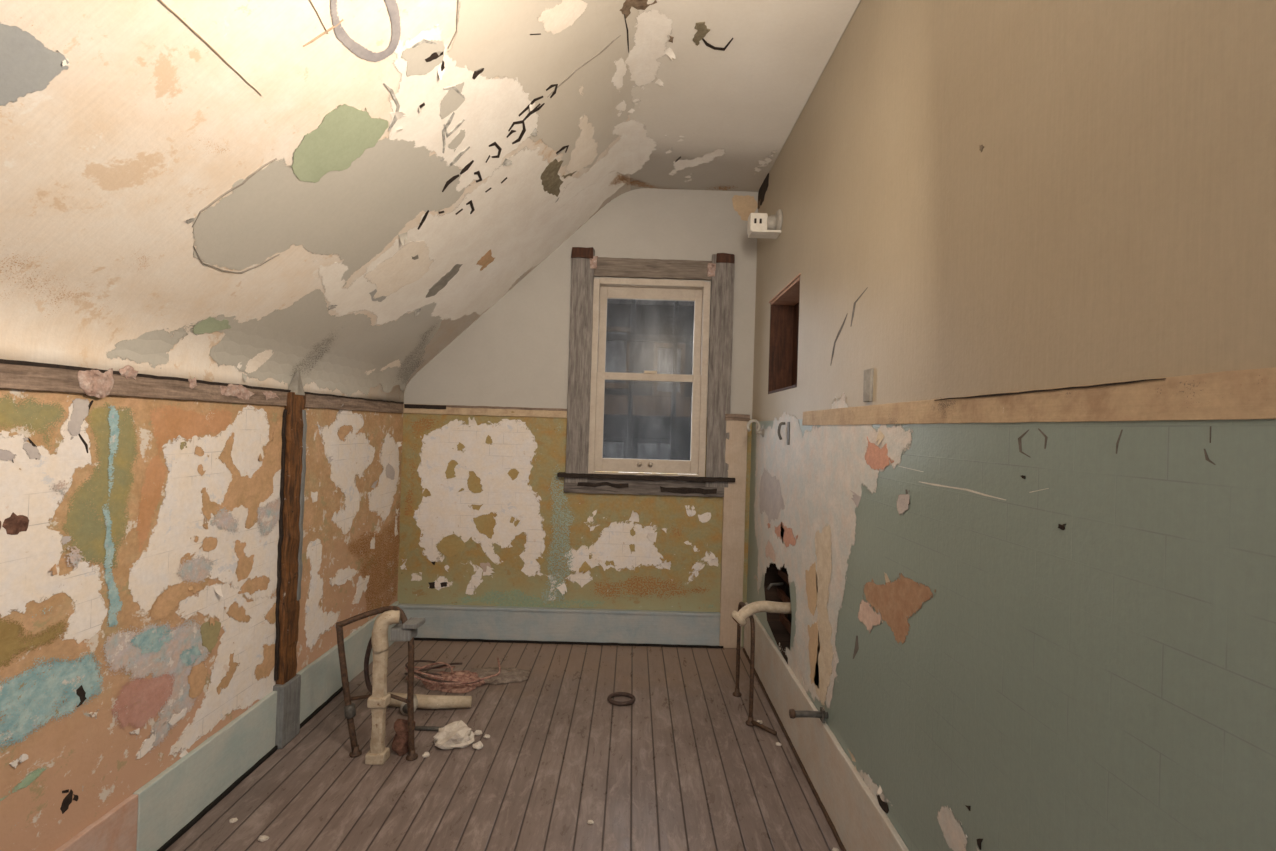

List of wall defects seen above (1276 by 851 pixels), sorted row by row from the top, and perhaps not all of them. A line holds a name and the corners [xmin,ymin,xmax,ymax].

peeling [0,0,725,759]
peeling [754,412,913,709]
peeling [9,754,28,769]
peeling [60,789,78,814]